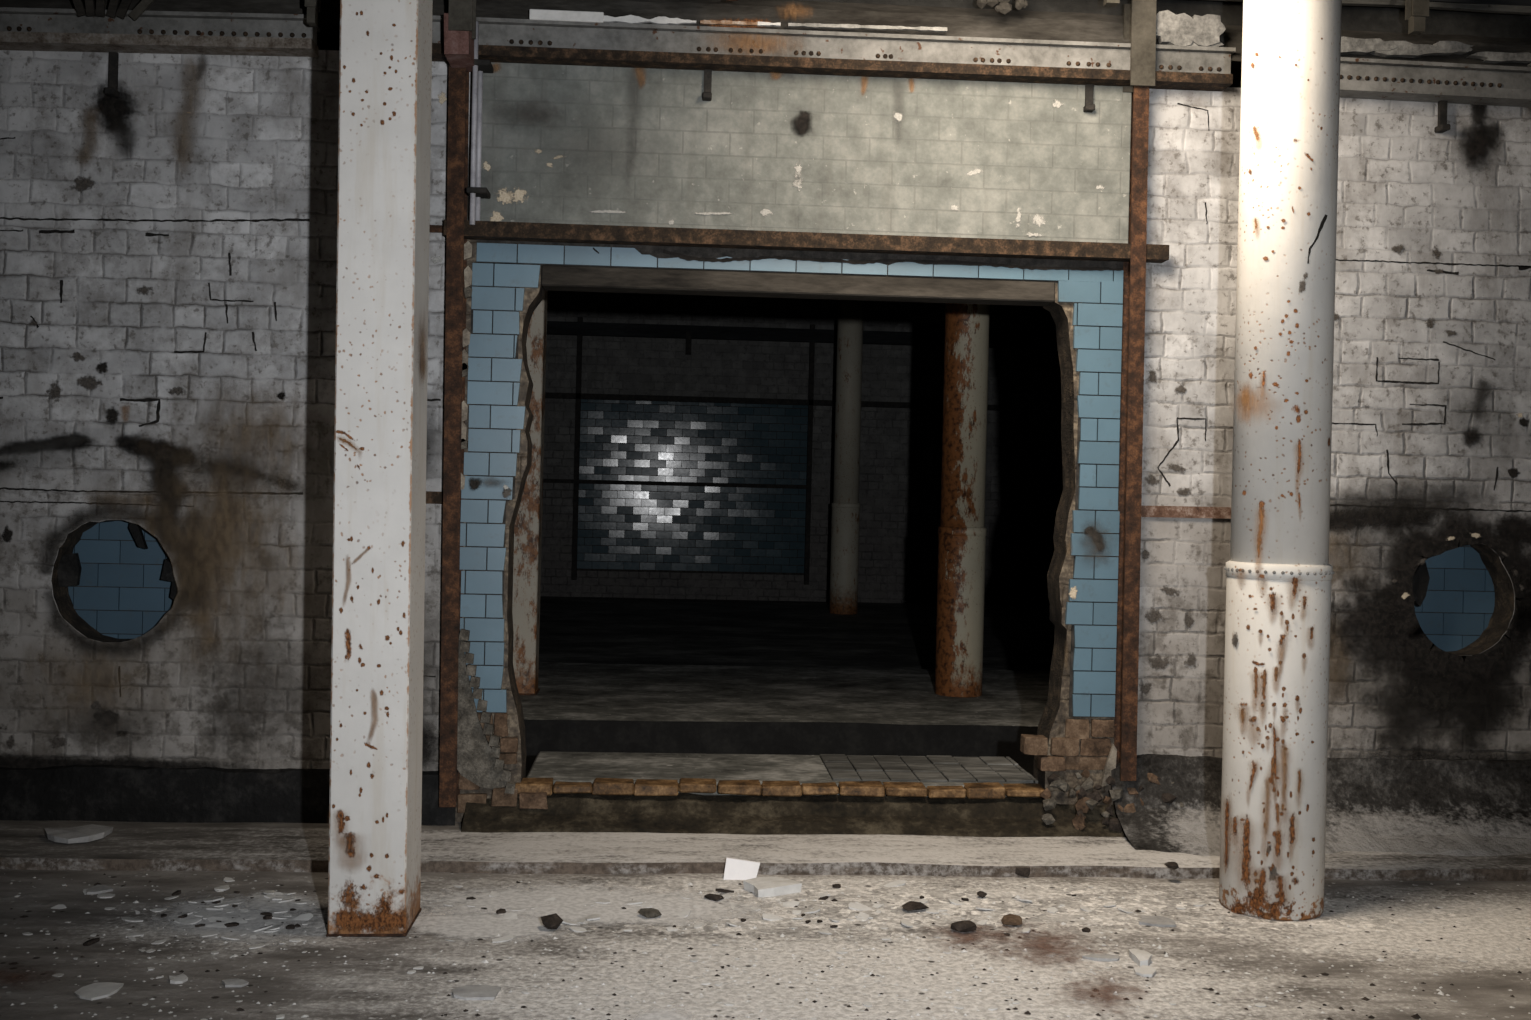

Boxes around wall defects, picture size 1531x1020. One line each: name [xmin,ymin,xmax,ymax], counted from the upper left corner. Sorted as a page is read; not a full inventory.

peeling [1156,10,1226,47]
peeling [1341,36,1531,67]
leakage [233,413,283,452]
rust [1243,372,1308,473]
spalling [469,478,512,498]
spalling [1084,527,1104,555]
rust [1242,491,1300,557]
leakage [1330,623,1348,693]
spalling [457,629,548,813]
rust [1224,575,1315,919]
rust [332,804,407,933]